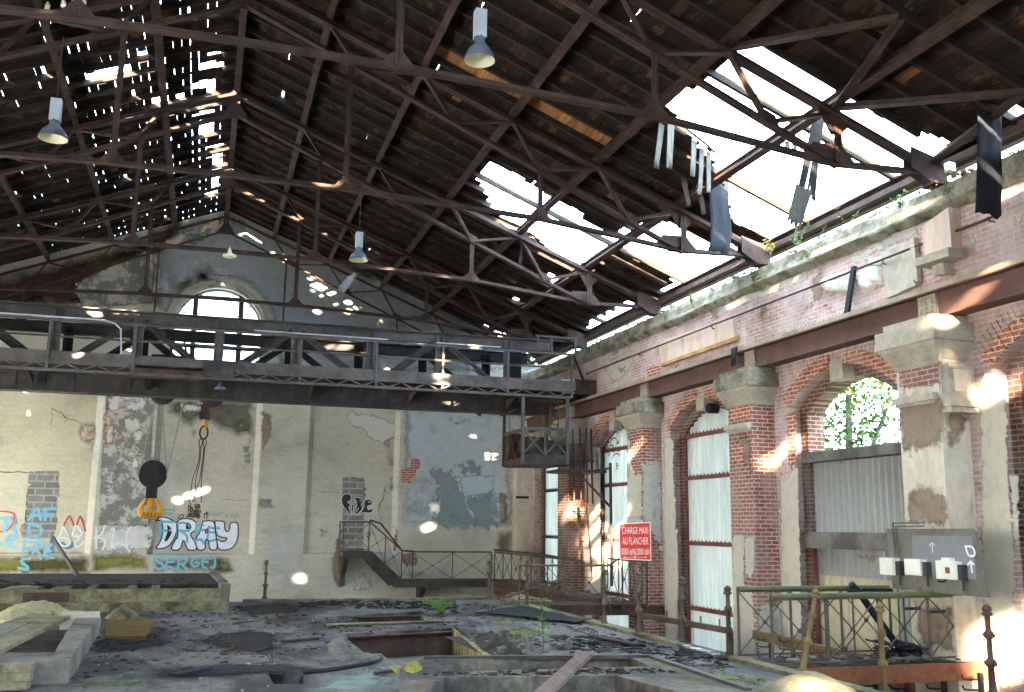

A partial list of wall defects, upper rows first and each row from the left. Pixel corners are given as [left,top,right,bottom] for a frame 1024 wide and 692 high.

spalling [96,396,157,551]
peeling [402,458,498,531]
peeling [626,437,721,655]
peeling [904,480,951,529]